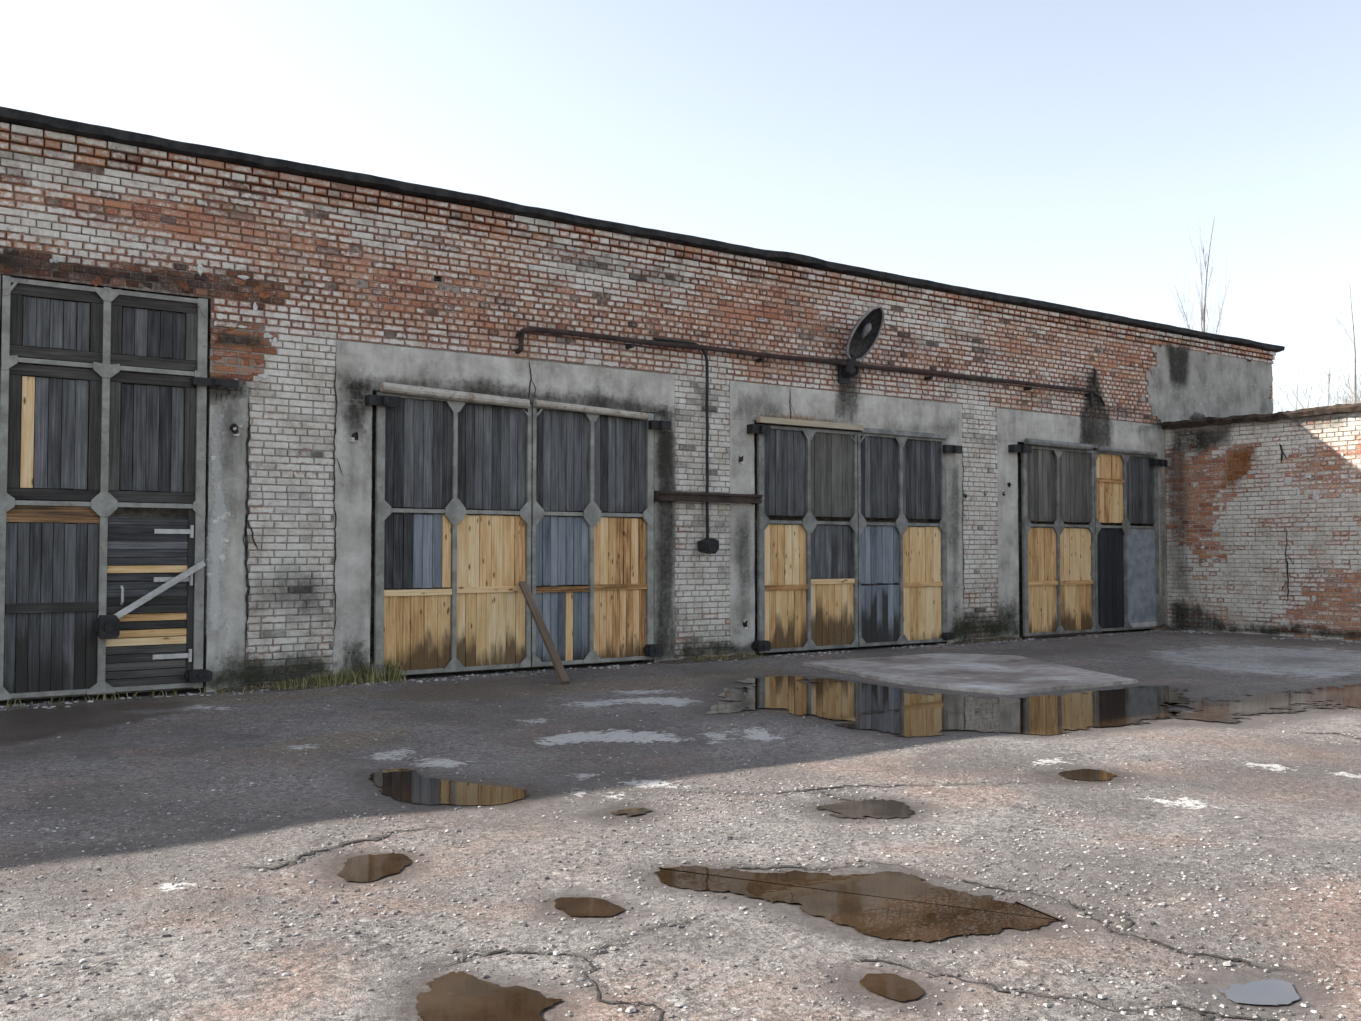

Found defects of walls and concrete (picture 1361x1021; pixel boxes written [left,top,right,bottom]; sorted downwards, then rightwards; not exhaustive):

spalling [0,250,288,388]
leakage [1080,375,1110,447]
peeling [1165,443,1261,567]
peeling [1274,442,1361,501]
peeling [1272,565,1361,641]
crack [584,920,687,960]